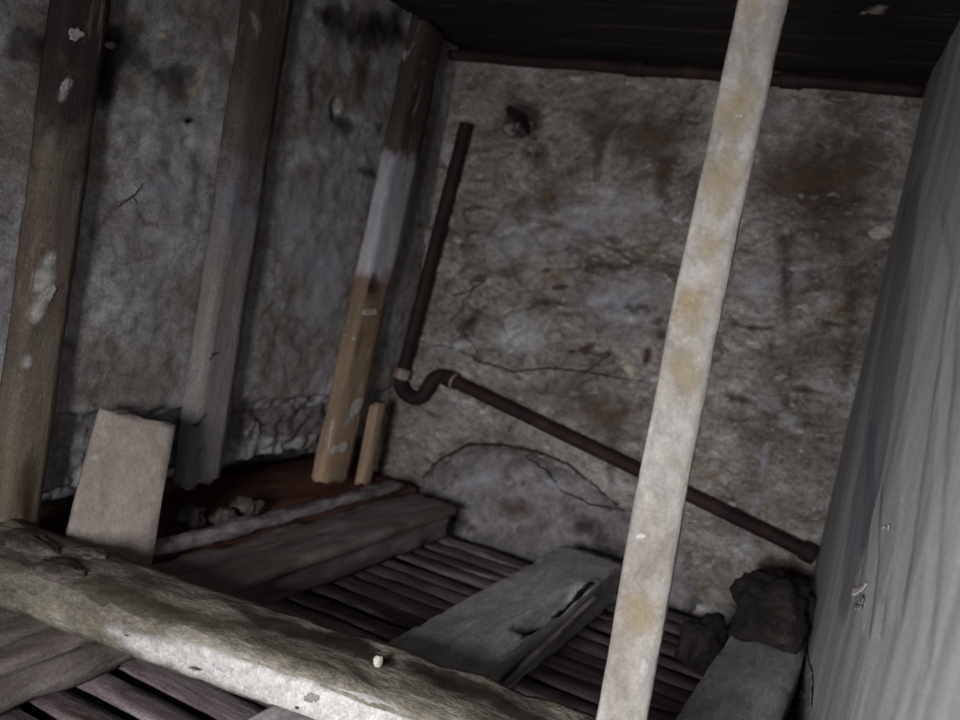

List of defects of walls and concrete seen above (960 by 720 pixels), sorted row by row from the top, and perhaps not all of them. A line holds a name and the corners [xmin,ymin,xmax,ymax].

spalling [504,104,539,136]
water stain [772,147,866,249]
crack [433,276,651,383]
spalling [227,396,325,444]